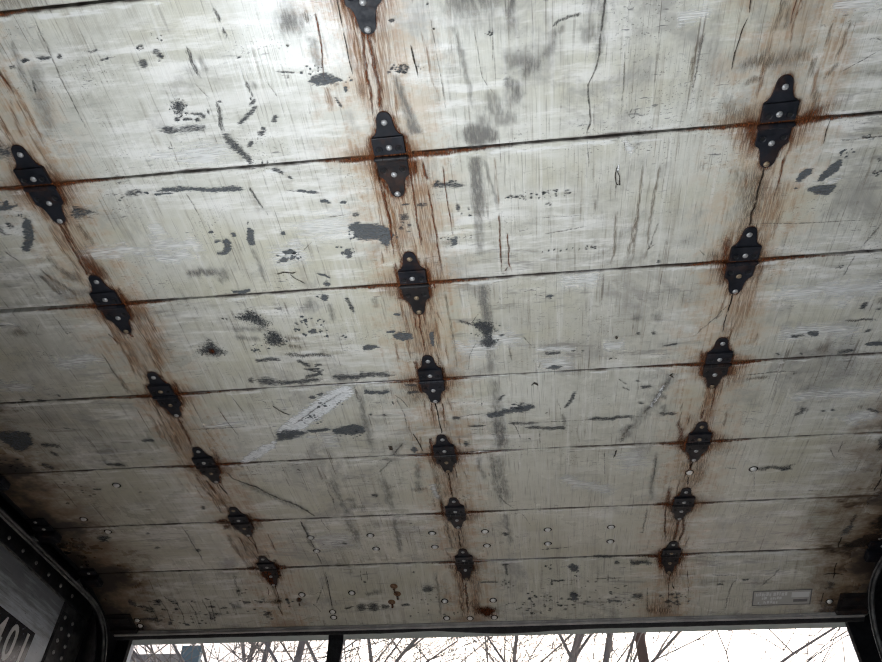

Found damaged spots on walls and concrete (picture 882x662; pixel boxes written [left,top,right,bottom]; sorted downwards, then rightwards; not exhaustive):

corrosion [0,105,298,614]
corrosion [325,0,505,416]
corrosion [409,435,501,616]
corrosion [637,331,767,612]
corrosion [681,179,843,314]
corrosion [688,72,863,220]